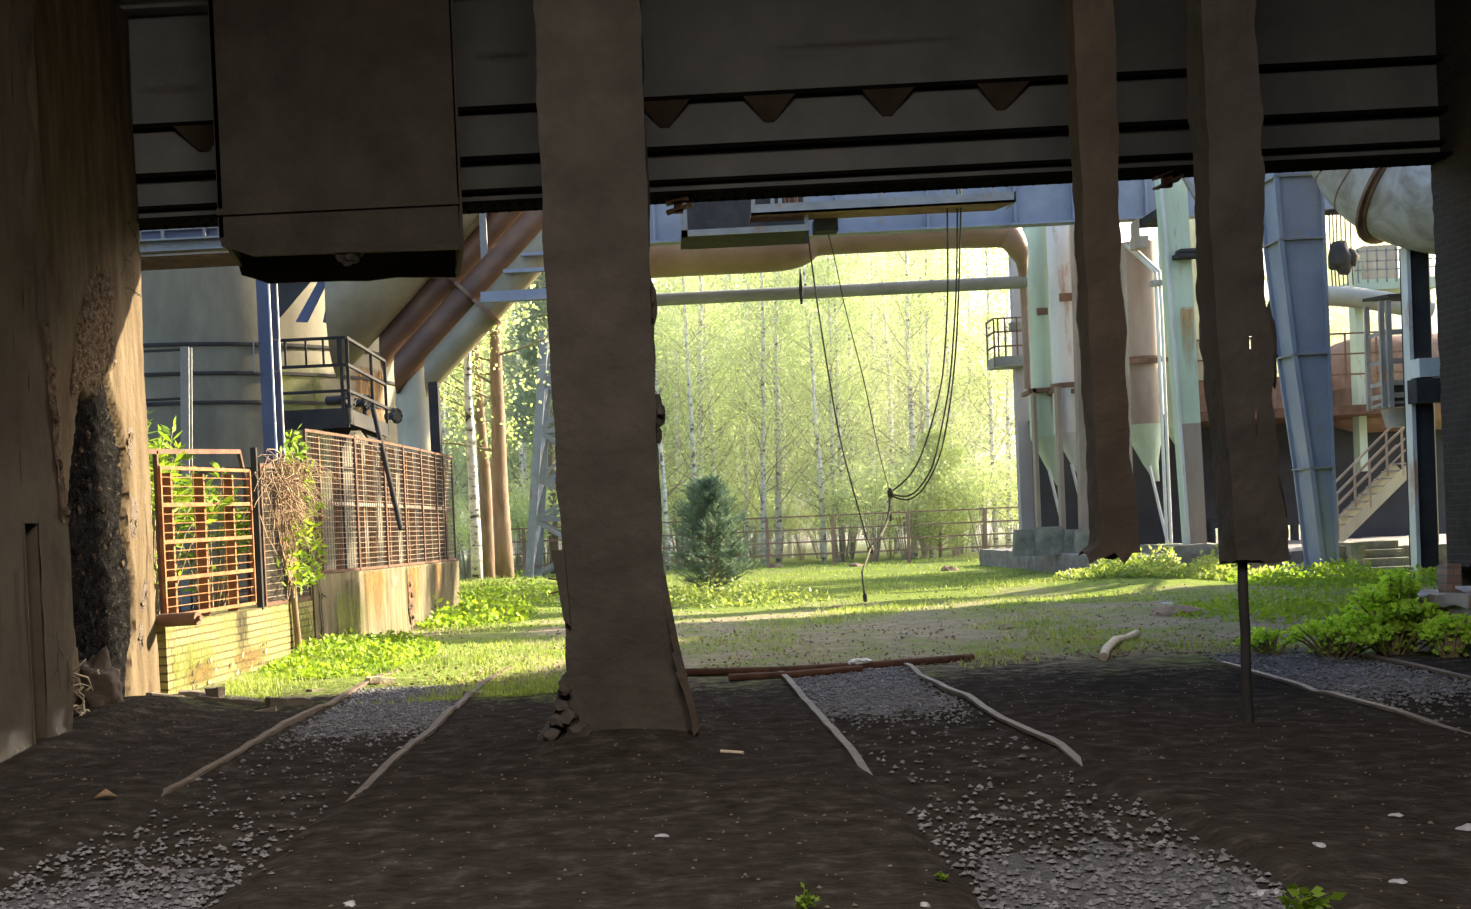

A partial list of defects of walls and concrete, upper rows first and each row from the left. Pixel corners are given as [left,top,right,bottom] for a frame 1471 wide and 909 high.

spalling [42,264,148,697]